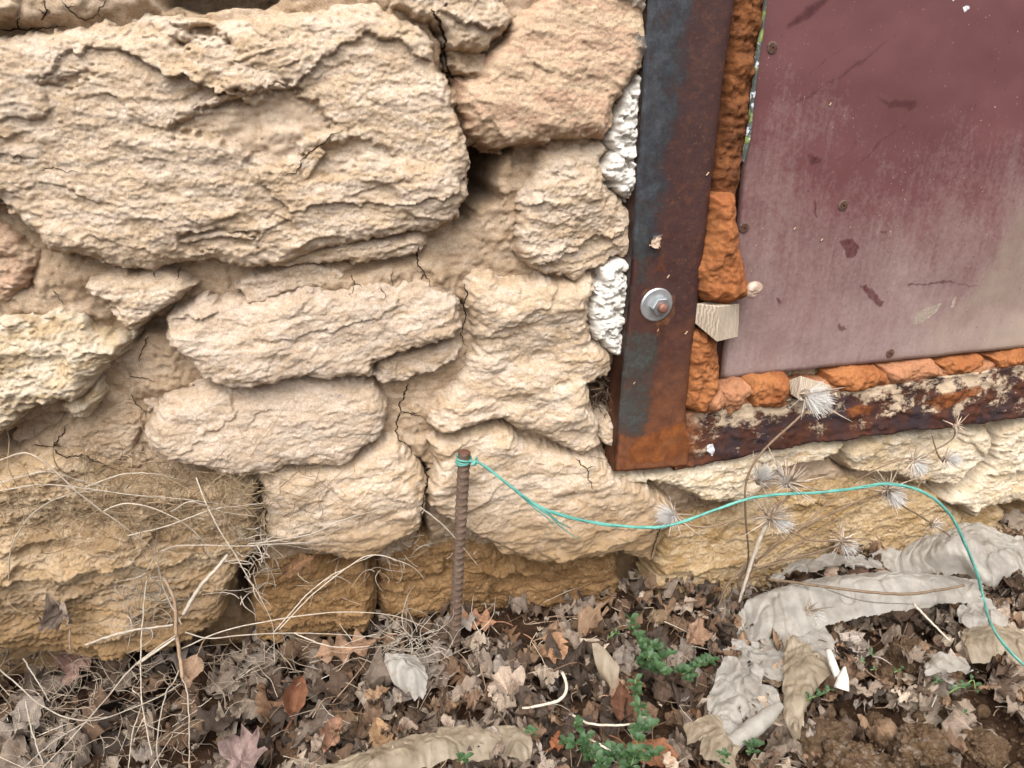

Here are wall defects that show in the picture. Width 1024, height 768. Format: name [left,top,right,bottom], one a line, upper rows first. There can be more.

crack [431,9,458,83]
corrosion [927,386,982,410]
crack [394,385,430,530]